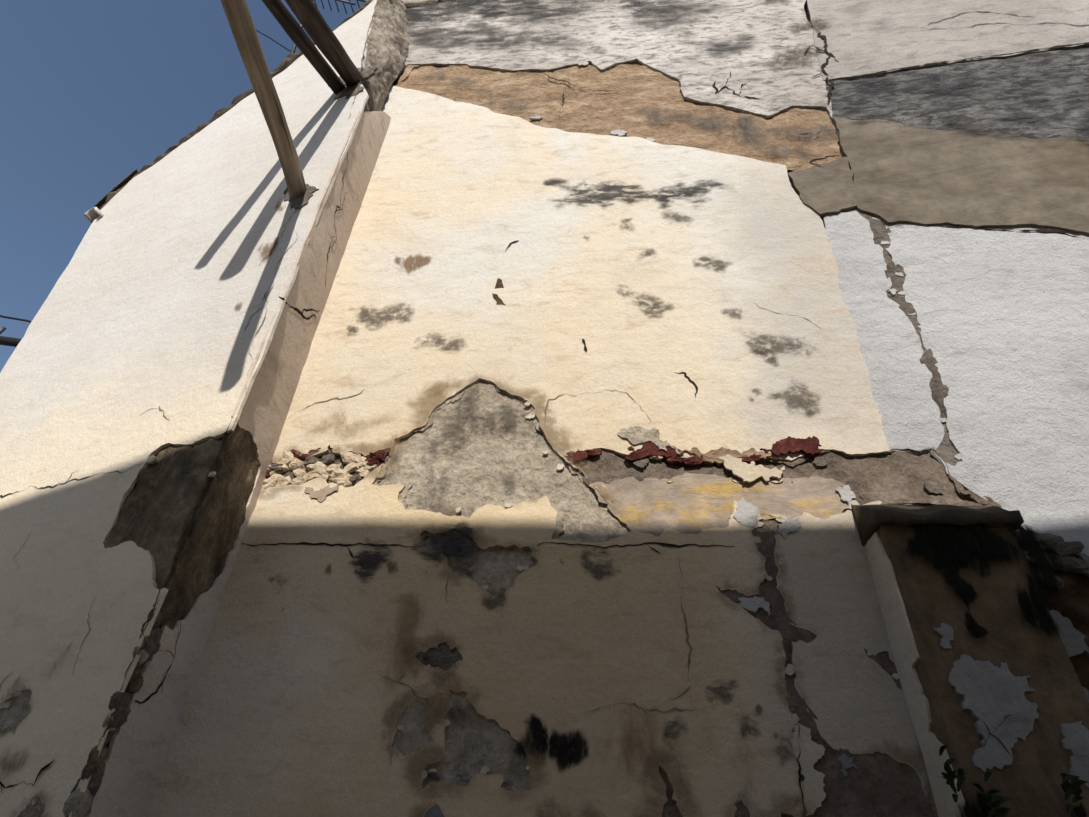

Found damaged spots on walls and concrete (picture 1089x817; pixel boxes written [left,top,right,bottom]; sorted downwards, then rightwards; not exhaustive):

leakage [791,20,826,33]
leakage [768,46,819,65]
spalling [395,62,843,171]
leakage [544,179,722,221]
crack [244,151,348,391]
crack [0,463,142,498]
crack [241,542,423,559]
spalling [63,377,1002,817]
spalling [1018,529,1089,702]
spalling [0,689,33,735]
crack [796,713,805,810]
spalling [18,794,45,817]